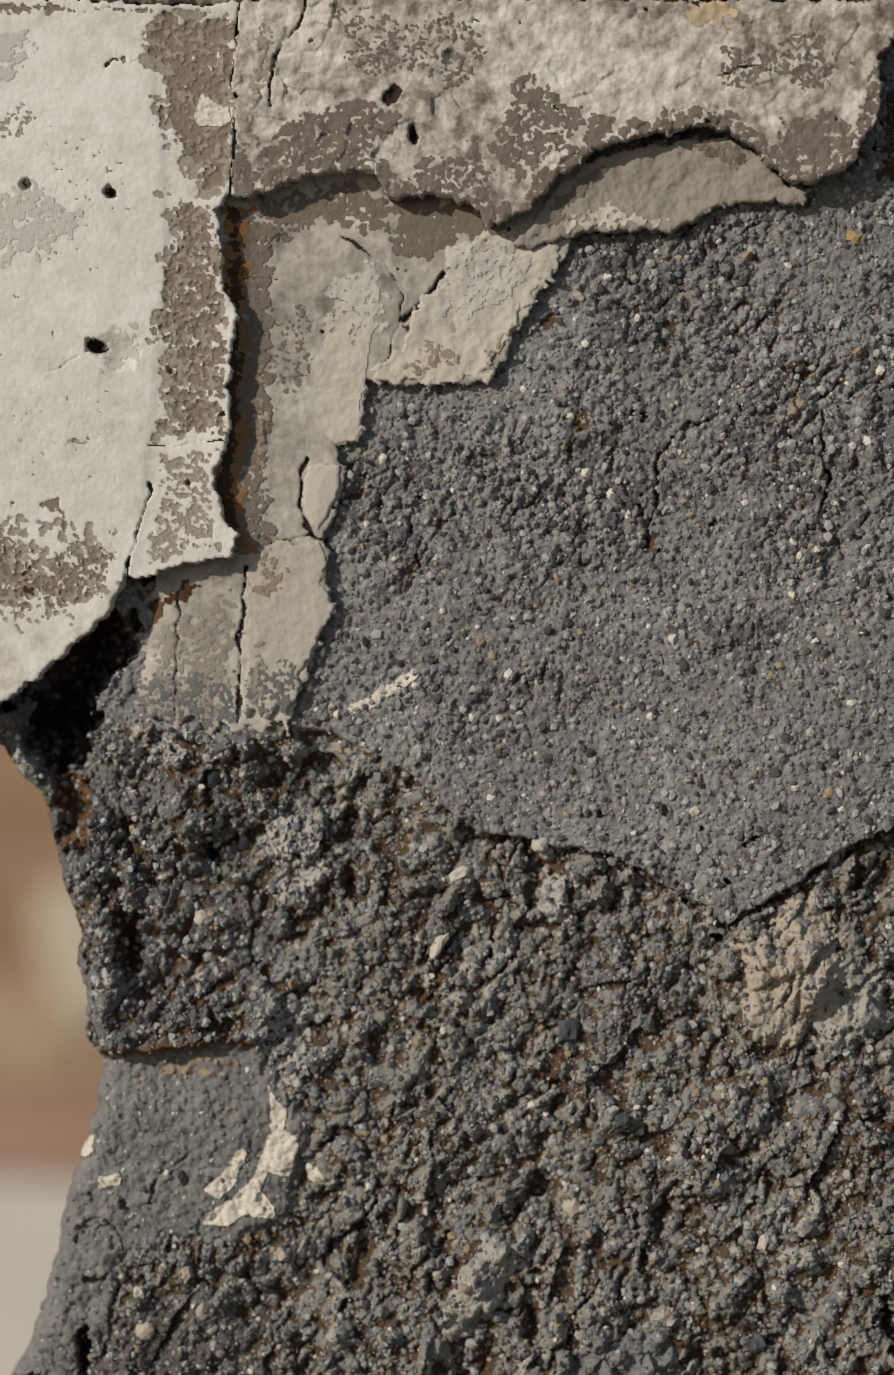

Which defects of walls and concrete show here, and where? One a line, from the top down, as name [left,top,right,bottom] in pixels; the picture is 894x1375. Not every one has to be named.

flaking render [0,0,894,565]
crack [173,600,181,702]
spalling [0,463,894,1375]